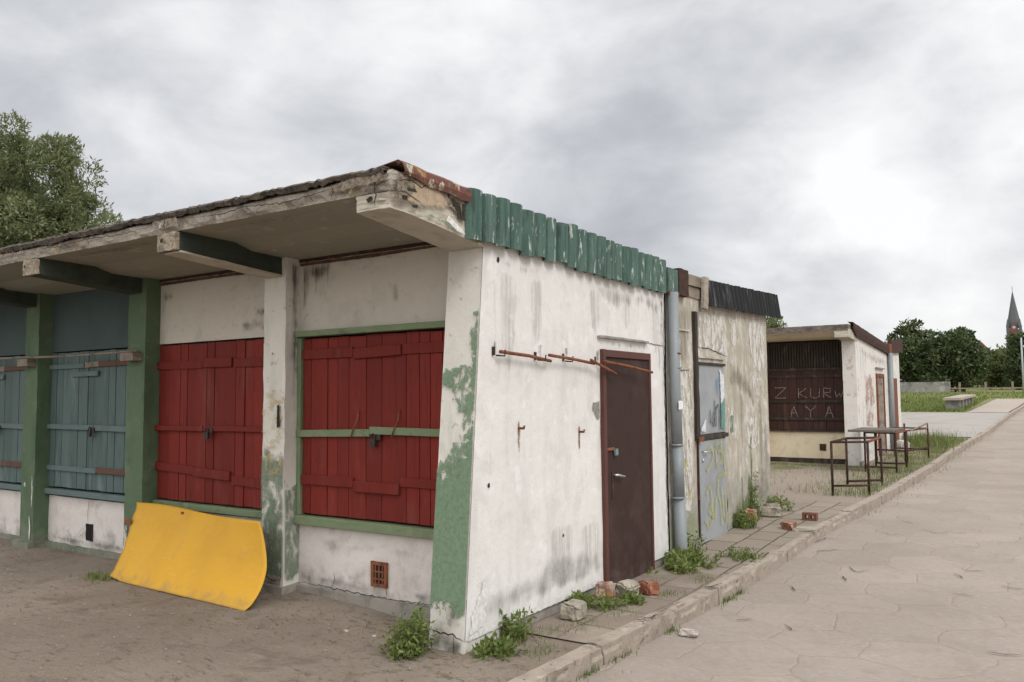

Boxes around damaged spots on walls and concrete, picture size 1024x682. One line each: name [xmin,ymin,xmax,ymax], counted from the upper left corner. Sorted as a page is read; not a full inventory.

peeling [261,390,299,585]
peeling [430,308,479,619]
peeling [698,311,764,450]